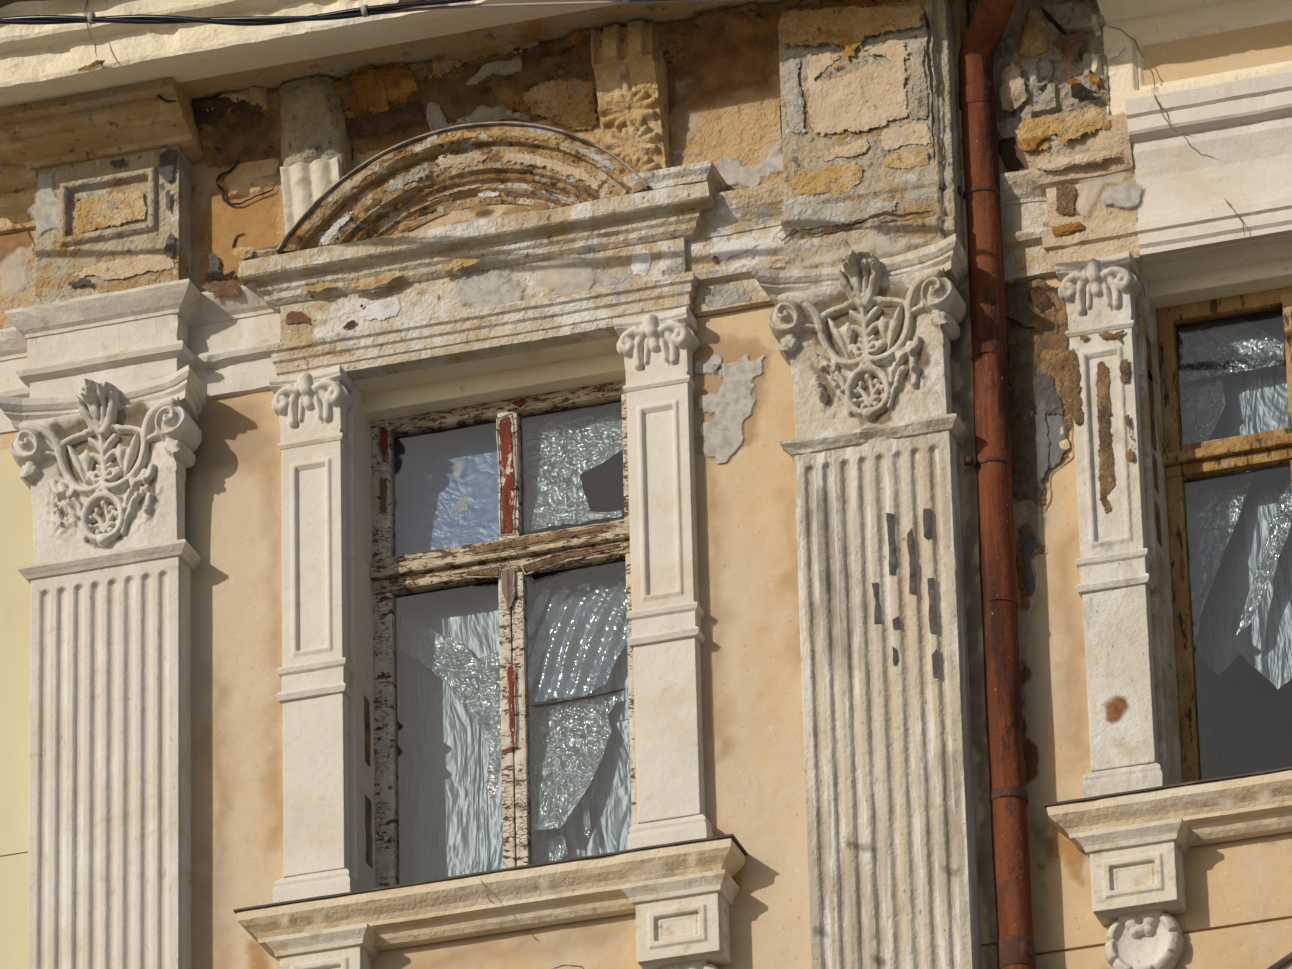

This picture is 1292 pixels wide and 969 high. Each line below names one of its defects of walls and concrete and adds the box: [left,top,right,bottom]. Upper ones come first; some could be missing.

flaking render [319,29,619,246]
flaking render [656,0,925,69]
flaking render [786,121,932,196]
flaking render [993,0,1124,238]
crack [1106,25,1196,138]
peeling [302,271,401,329]
peeling [436,257,525,309]
peeling [694,353,764,464]
flaking render [1005,277,1134,615]
peeling [1146,335,1162,548]
rust [1020,664,1038,784]
rust [1106,696,1127,721]